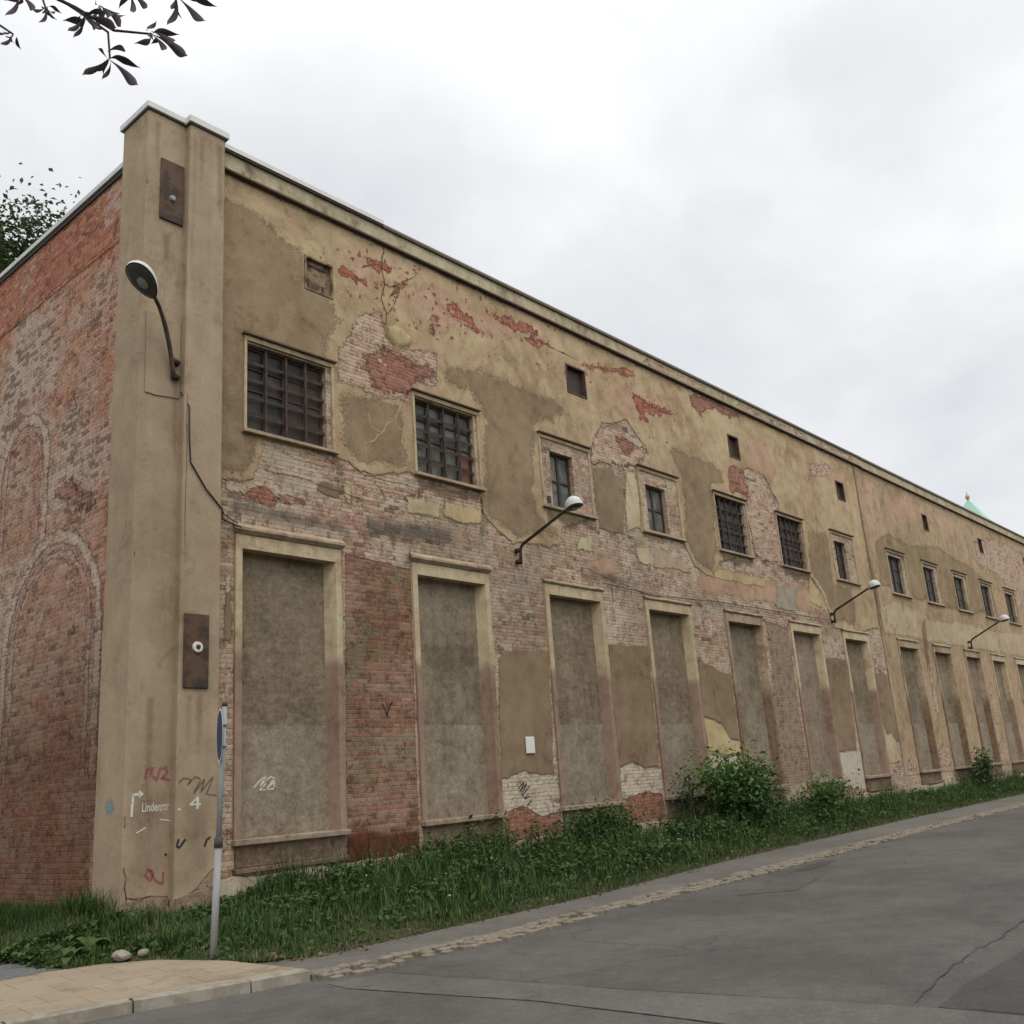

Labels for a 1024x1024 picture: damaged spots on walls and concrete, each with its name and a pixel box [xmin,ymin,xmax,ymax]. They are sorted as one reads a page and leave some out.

crack [361,246,413,337]
spalling [336,244,564,403]
crack [365,391,408,464]
spalling [581,358,805,471]
spalling [240,485,308,509]
spalling [417,487,482,509]
spalling [728,465,782,564]
peeling [502,770,562,842]
peeling [620,763,666,824]